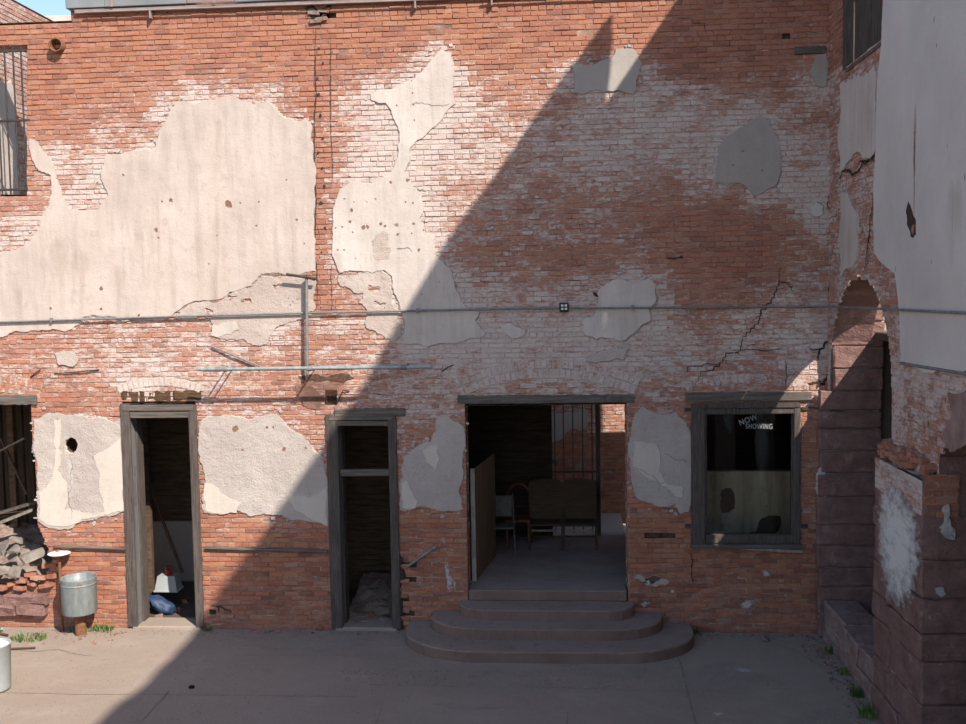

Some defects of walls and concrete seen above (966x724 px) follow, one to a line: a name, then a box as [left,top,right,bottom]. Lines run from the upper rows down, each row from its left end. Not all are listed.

peeling [571,44,643,98]
peeling [0,43,486,350]
crack [314,36,333,310]
peeling [579,272,660,346]
crack [685,269,828,390]
peeling [30,407,124,591]
peeling [198,409,329,526]
peeling [626,406,691,516]
peeling [939,504,956,541]